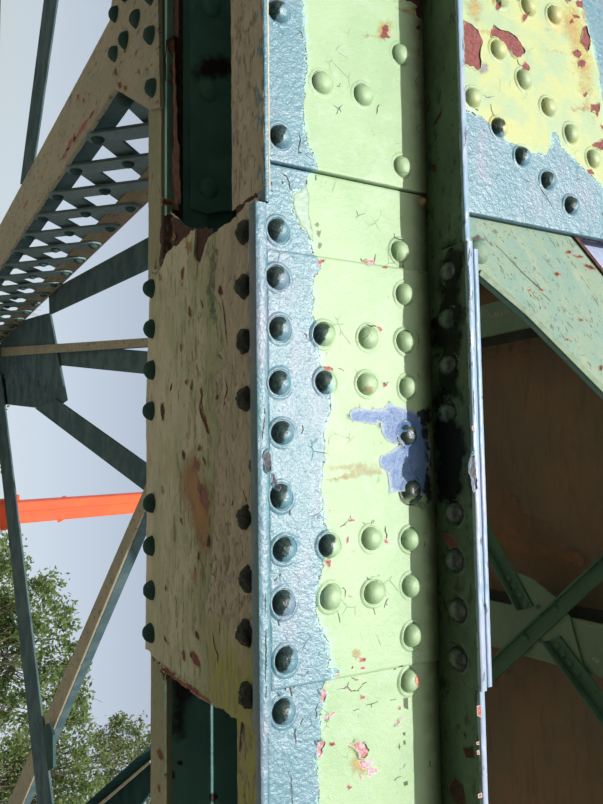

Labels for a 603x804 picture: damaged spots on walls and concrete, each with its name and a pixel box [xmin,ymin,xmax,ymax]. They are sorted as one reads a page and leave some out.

rust [405,0,423,30]
rust [195,55,232,79]
rust [152,35,213,281]
rust [151,655,212,738]
peeling [317,674,340,702]
peeling [314,739,335,760]
peeling [347,738,378,779]